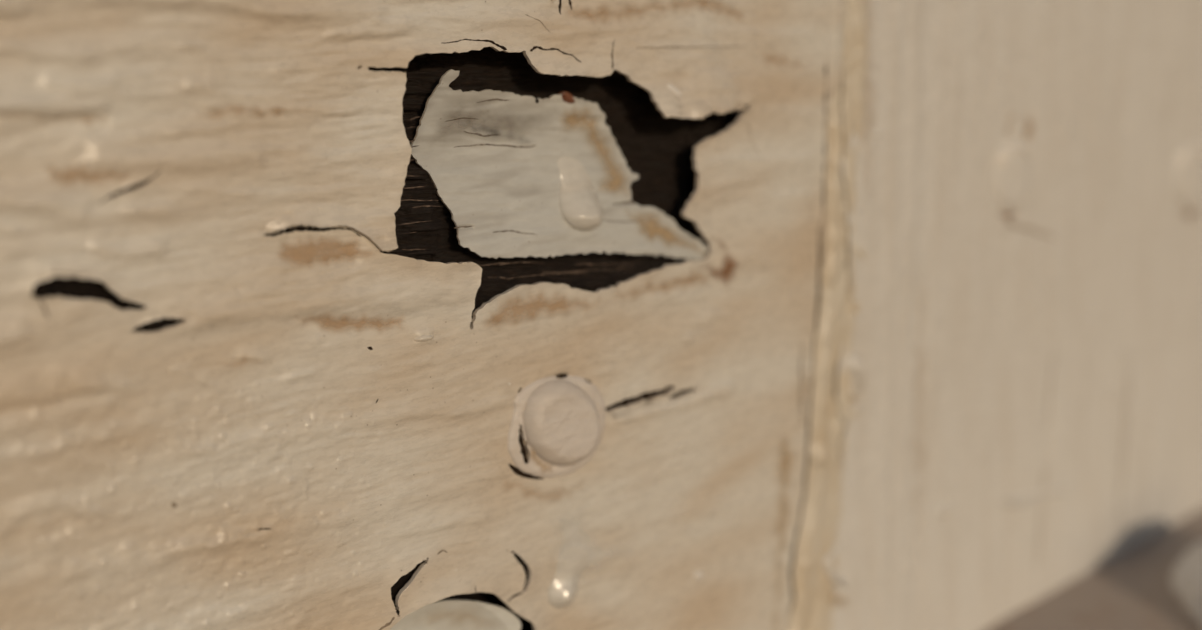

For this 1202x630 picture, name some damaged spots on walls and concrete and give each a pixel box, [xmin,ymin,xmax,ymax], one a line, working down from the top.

spalling [263,39,737,328]
spalling [133,317,183,332]
crack [605,386,692,411]